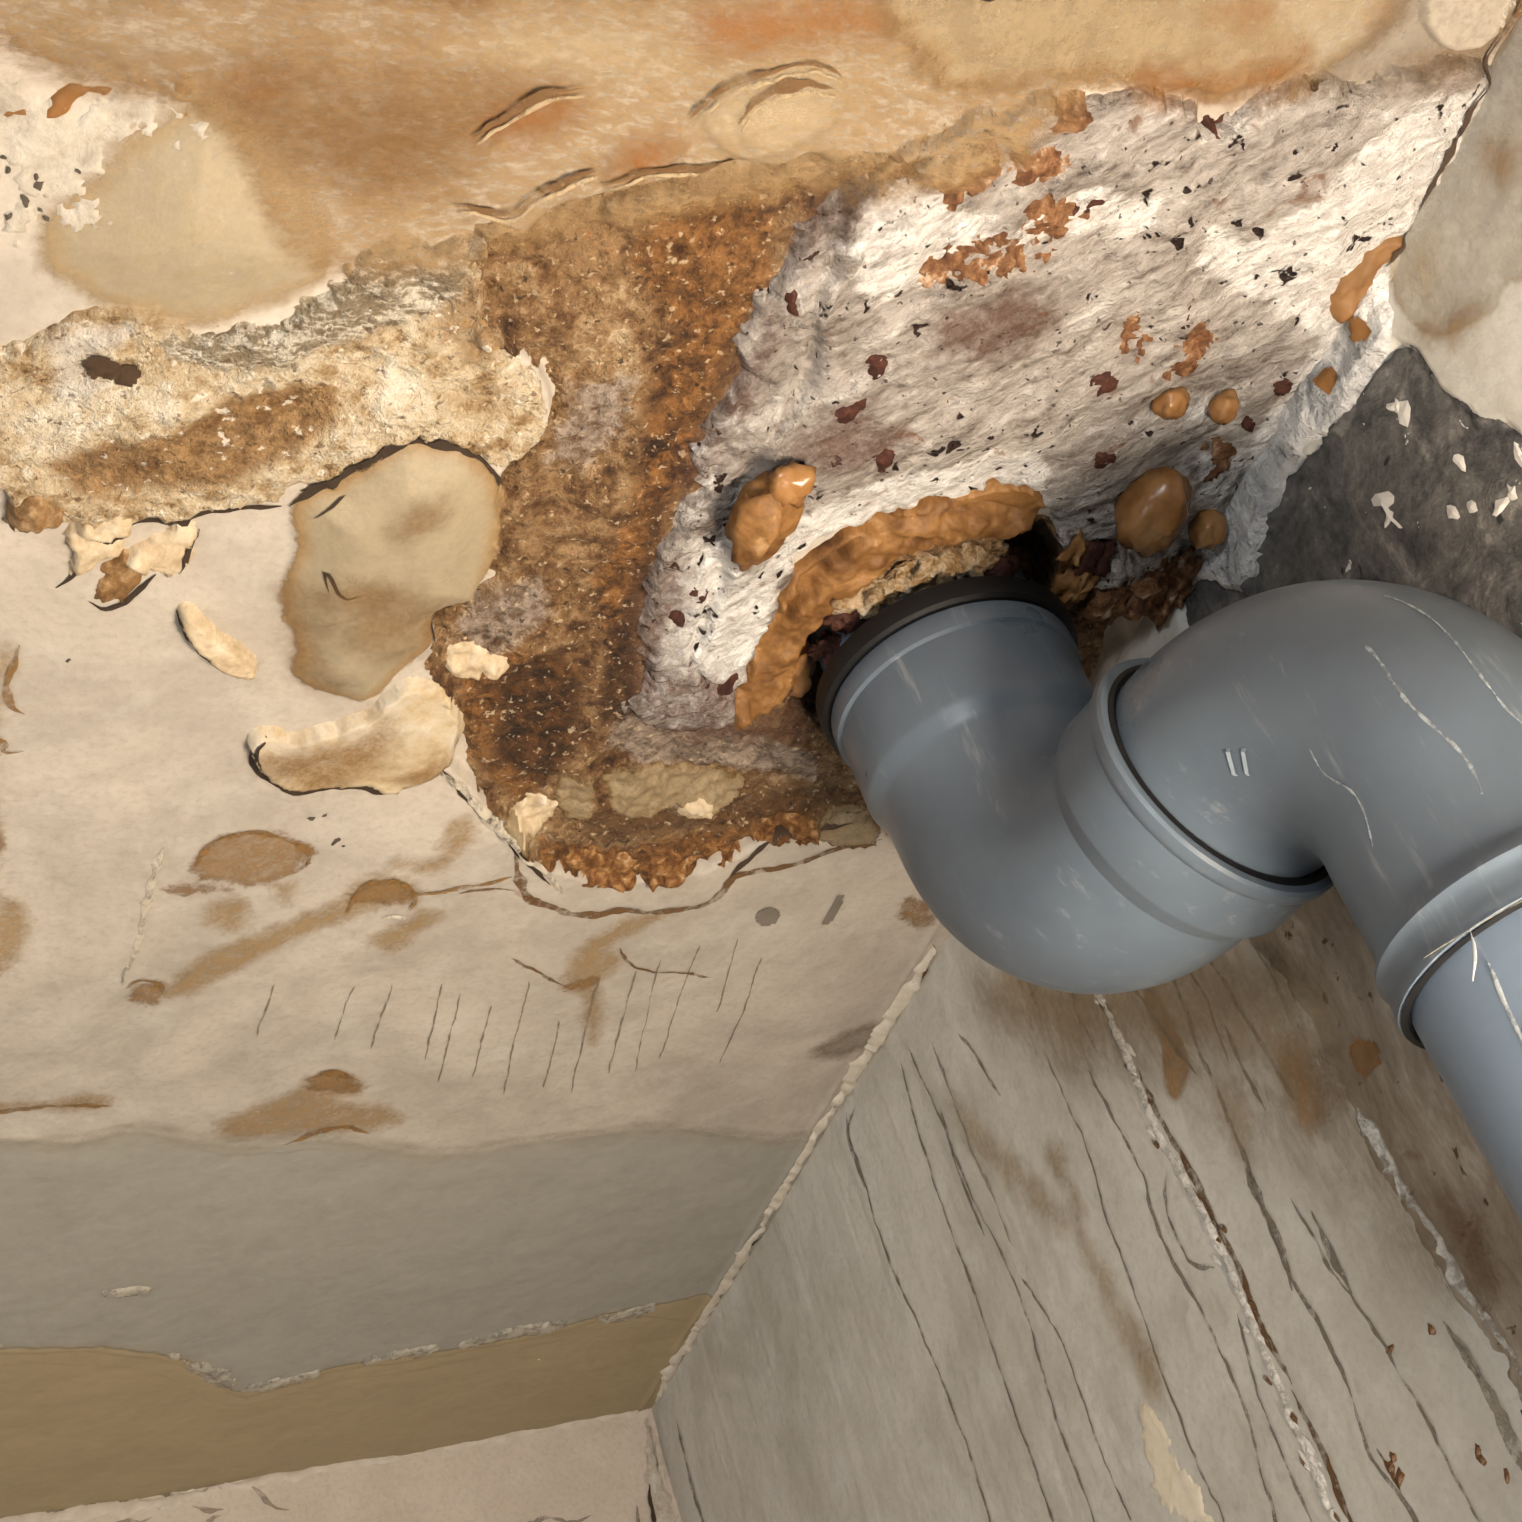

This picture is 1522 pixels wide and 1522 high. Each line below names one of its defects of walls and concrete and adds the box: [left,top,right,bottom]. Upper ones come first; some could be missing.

peeling [1419,0,1513,51]
flaking render [0,151,888,893]
damp [0,0,1522,739]
flaking render [882,514,1063,589]
peeling [1186,344,1522,639]
flaking render [0,1294,722,1522]
crack [1048,994,1353,1522]
crack [1173,974,1478,1522]
crack [1356,1108,1522,1470]